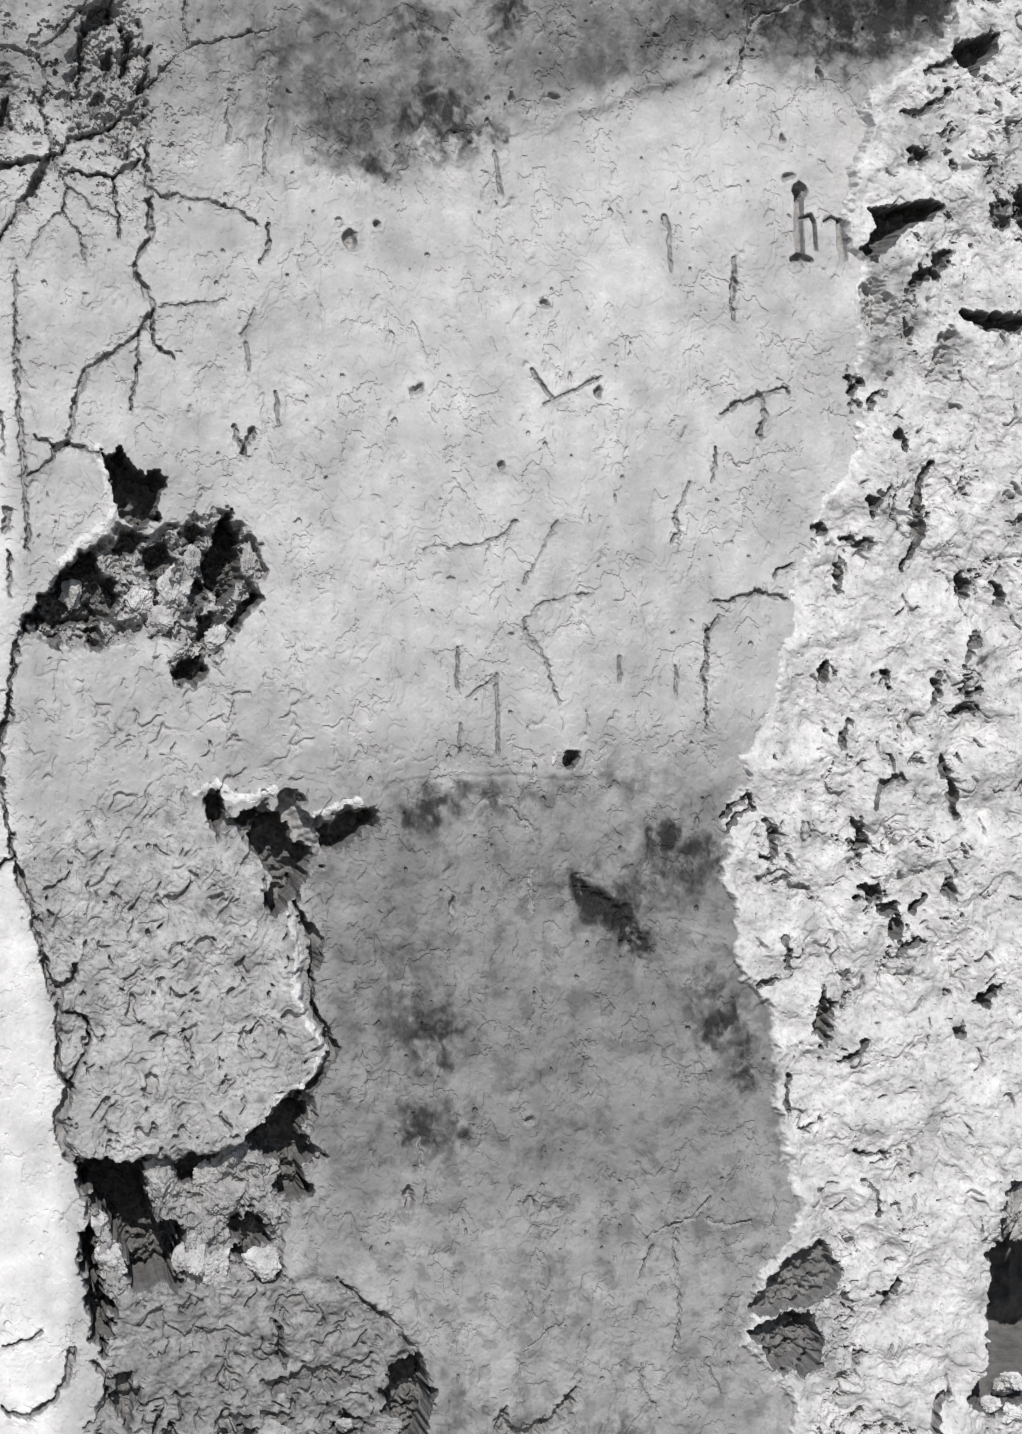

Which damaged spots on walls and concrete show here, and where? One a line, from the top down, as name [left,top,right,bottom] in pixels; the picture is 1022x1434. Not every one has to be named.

crack [0,0,278,1164]
spalling [17,443,270,691]
spalling [203,790,376,919]
spalling [718,0,1022,1434]
spalling [248,1095,326,1204]
spalling [74,1151,439,1434]